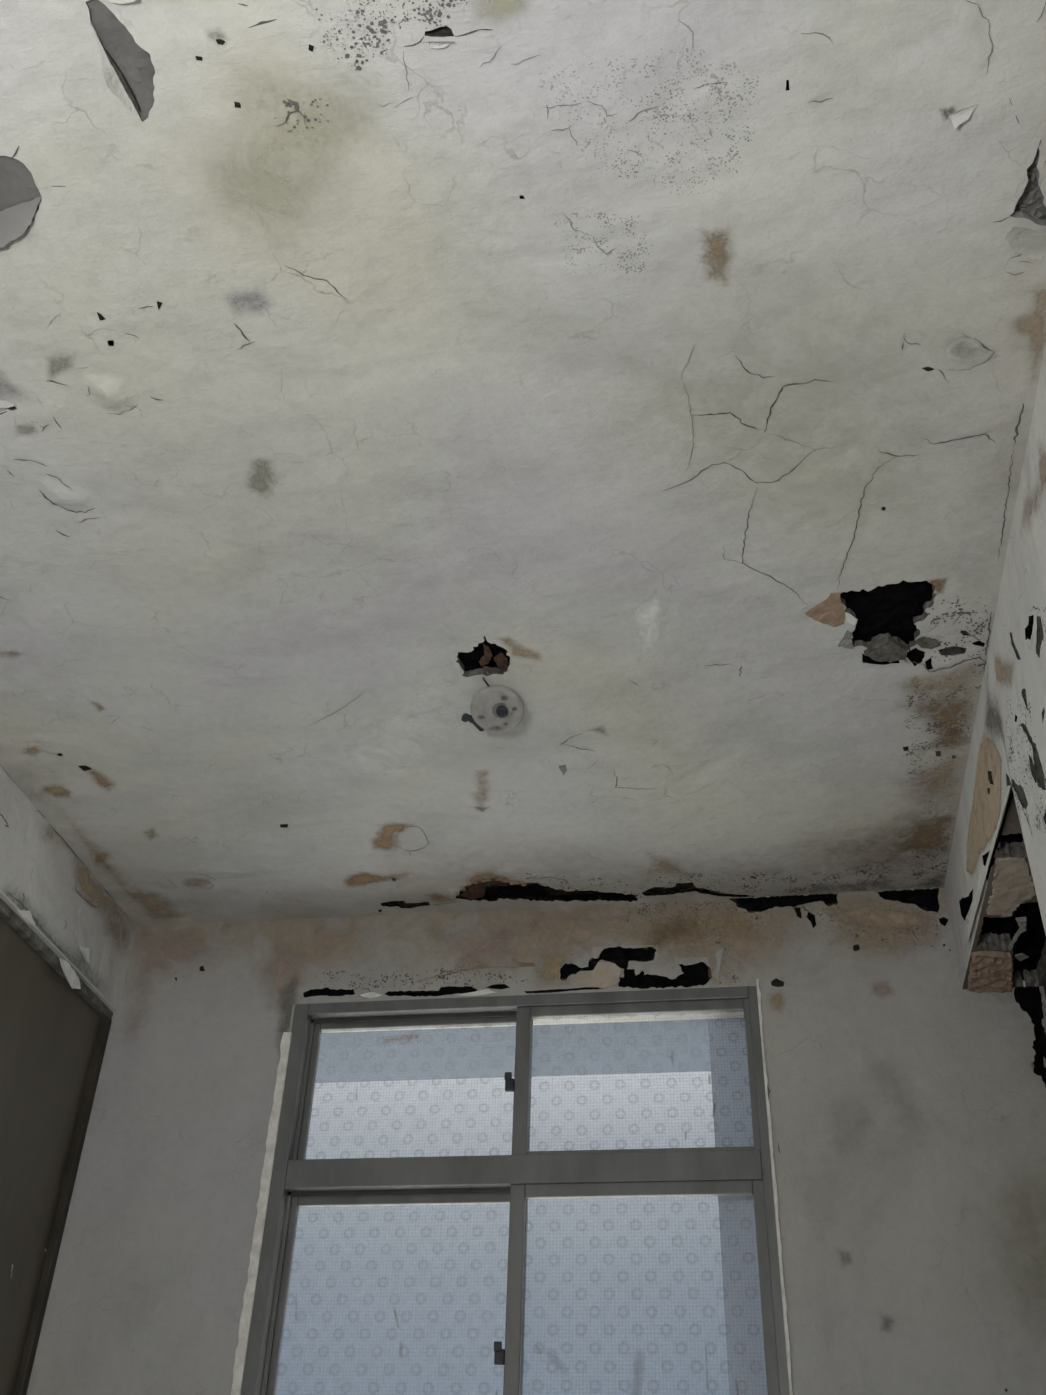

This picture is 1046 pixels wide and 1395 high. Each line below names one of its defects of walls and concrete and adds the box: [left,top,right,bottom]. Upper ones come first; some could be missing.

peeling [86,0,155,122]
peeling [0,146,41,248]
spalling [996,140,1046,275]
crack [663,349,834,604]
crack [837,404,1024,588]
spalling [456,636,536,677]
spalling [805,580,986,673]
crack [984,612,992,656]
water stain [519,596,1046,985]
spalling [378,877,838,928]
water stain [315,968,528,989]
spalling [1014,986,1046,1087]